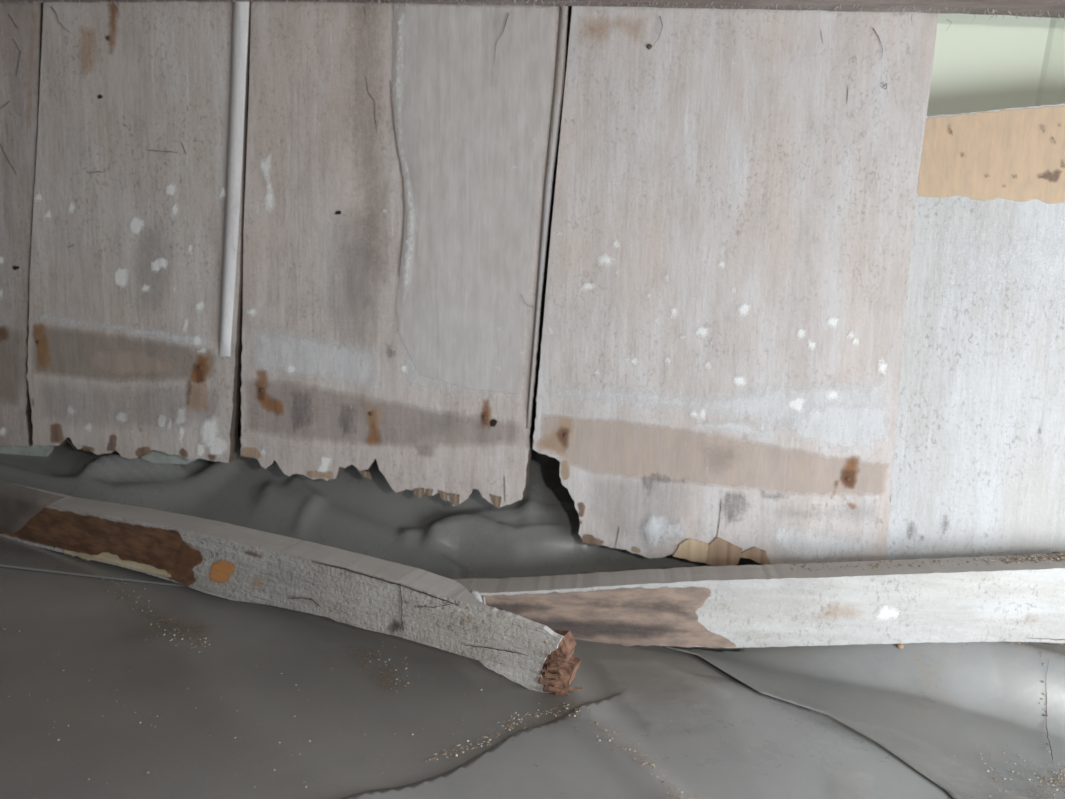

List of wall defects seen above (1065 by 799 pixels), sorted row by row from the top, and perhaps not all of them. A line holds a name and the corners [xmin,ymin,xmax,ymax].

peeling [917,106,1065,204]
leakage [152,258,167,271]
spalling [51,424,64,443]
leakage [197,416,227,456]
leakage [545,360,886,493]
spalling [241,447,261,458]
leakage [318,457,331,472]
rust [836,458,857,486]
spalling [414,488,460,506]
spalling [578,502,603,545]
spalling [673,537,771,566]
leakage [776,528,861,560]